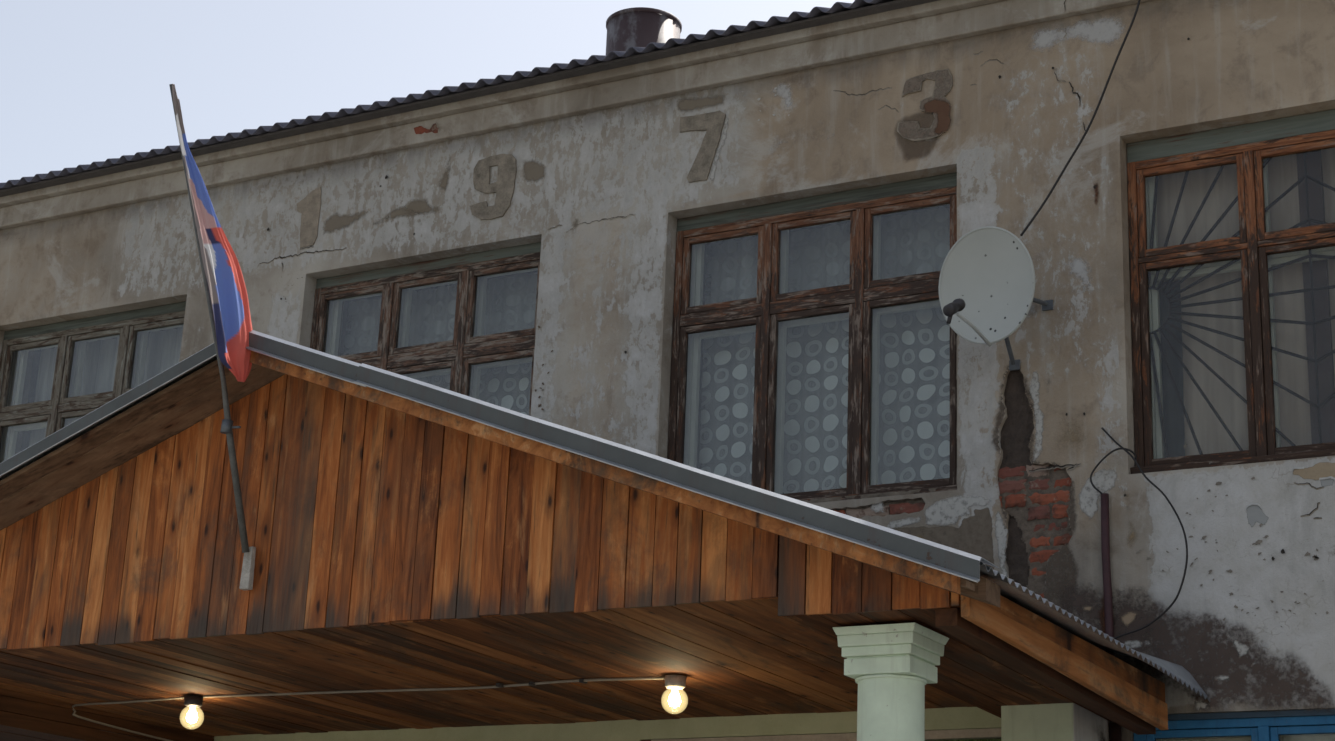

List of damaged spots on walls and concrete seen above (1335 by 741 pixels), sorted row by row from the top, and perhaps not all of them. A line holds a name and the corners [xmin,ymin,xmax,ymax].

crack [833,87,899,113]
crack [1054,0,1086,131]
crack [257,246,347,271]
spalling [800,370,1117,598]
peeling [1292,462,1335,487]
damp [1043,481,1334,711]